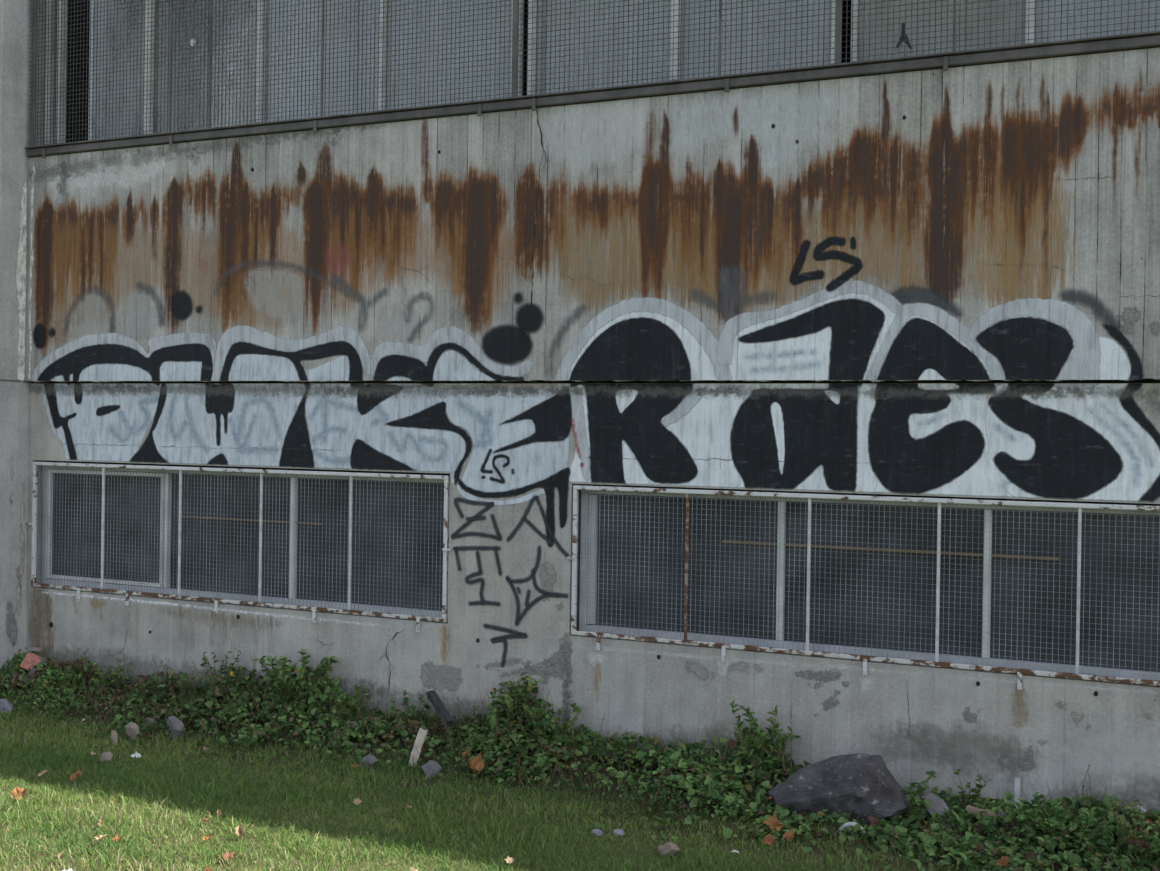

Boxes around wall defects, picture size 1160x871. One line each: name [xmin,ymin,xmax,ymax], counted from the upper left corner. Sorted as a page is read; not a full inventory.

crack [500,112,622,304]
corrosion [35,75,1160,346]